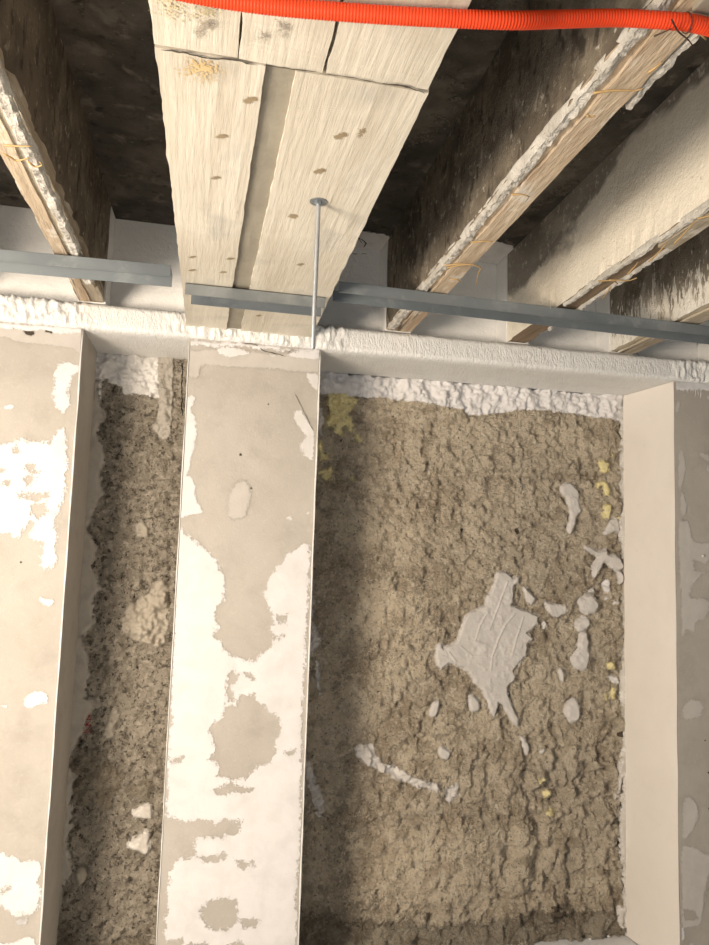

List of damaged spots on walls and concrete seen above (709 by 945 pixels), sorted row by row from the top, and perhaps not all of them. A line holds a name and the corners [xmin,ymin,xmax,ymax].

peeling [131,803,154,820]